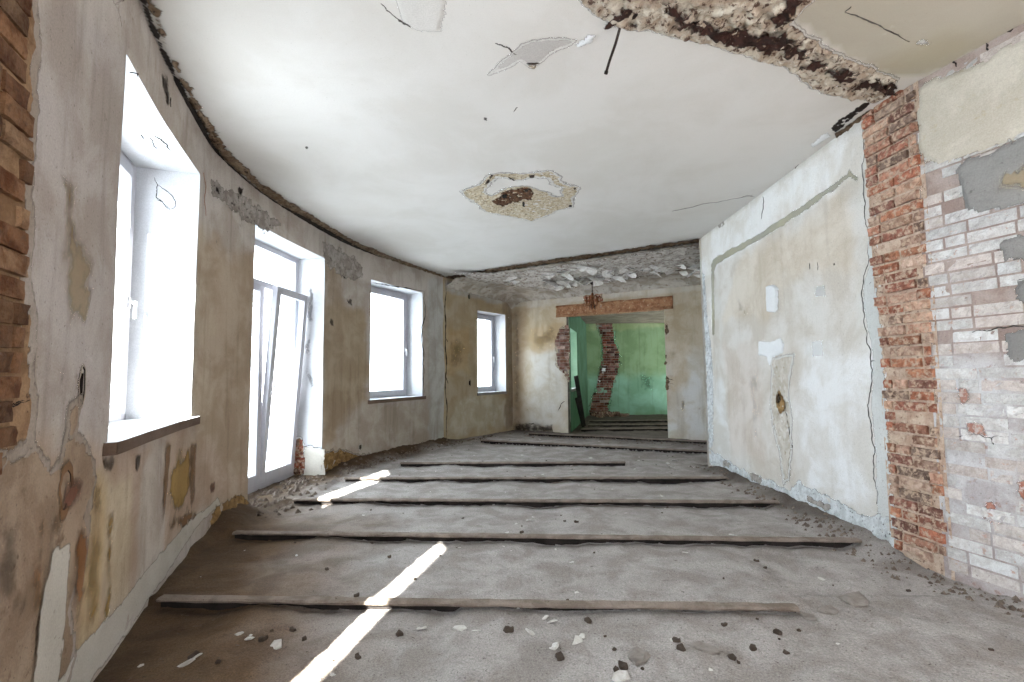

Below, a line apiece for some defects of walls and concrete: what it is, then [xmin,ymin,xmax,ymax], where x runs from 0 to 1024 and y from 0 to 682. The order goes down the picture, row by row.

peeling [488,35,595,76]
crack [845,7,910,42]
peeling [211,179,281,234]
peeling [323,242,362,280]
flaking render [0,0,97,682]
flaking render [453,86,947,563]
crack [861,139,878,504]
water stain [163,444,197,528]